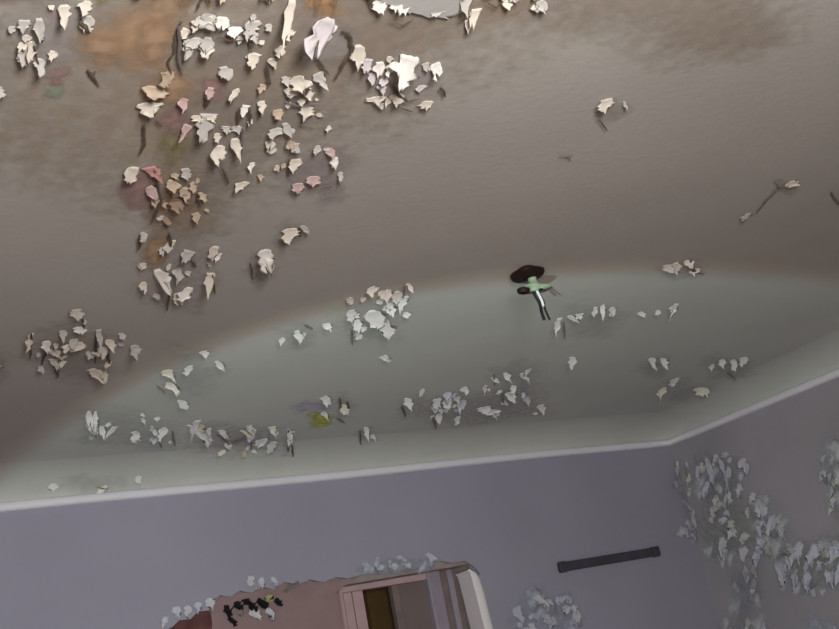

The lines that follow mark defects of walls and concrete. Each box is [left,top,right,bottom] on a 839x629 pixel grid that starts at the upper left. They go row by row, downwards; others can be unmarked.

peeling [8,0,95,78]
peeling [368,0,549,35]
water stain [56,0,415,237]
peeling [177,0,446,196]
crack [750,182,788,216]
peeling [137,168,222,311]
peeling [249,249,275,280]
peeling [25,309,142,387]
peeling [345,283,413,346]
peeling [424,368,546,429]
peeling [674,441,839,629]
spalling [161,575,354,629]